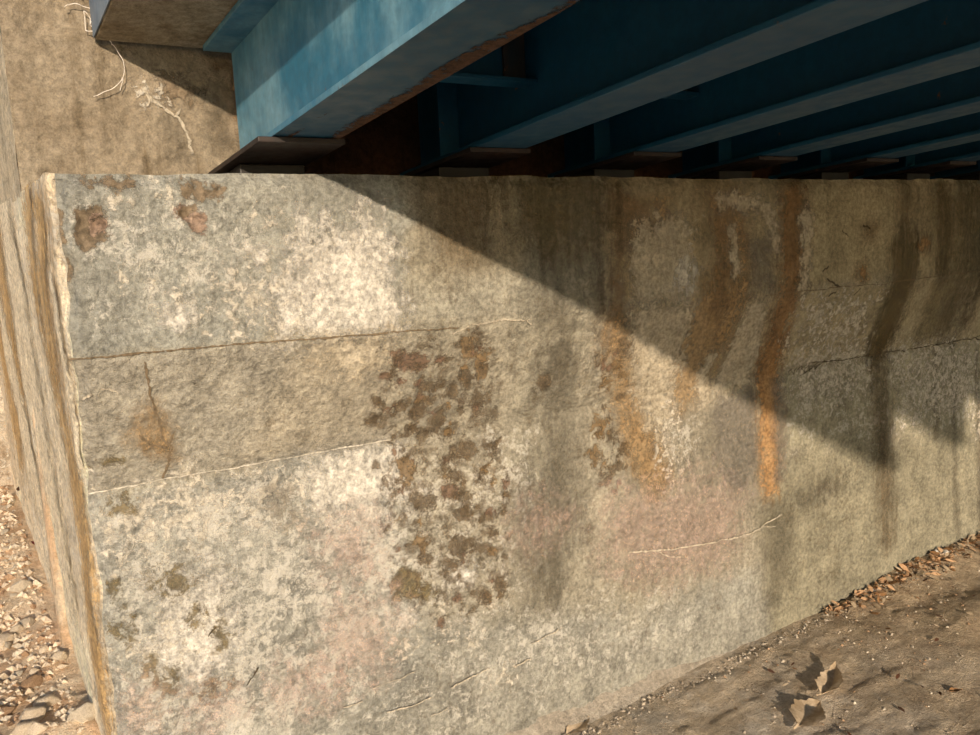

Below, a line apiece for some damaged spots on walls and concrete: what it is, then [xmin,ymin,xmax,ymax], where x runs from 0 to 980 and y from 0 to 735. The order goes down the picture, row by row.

rust [0,234,25,468]
rust [21,184,114,735]
rust [612,316,665,490]
rust [672,193,749,409]
efflorescence [716,190,780,279]
rust [755,184,807,496]
damp [778,180,980,547]
crack [813,335,980,363]
damp [379,568,485,662]